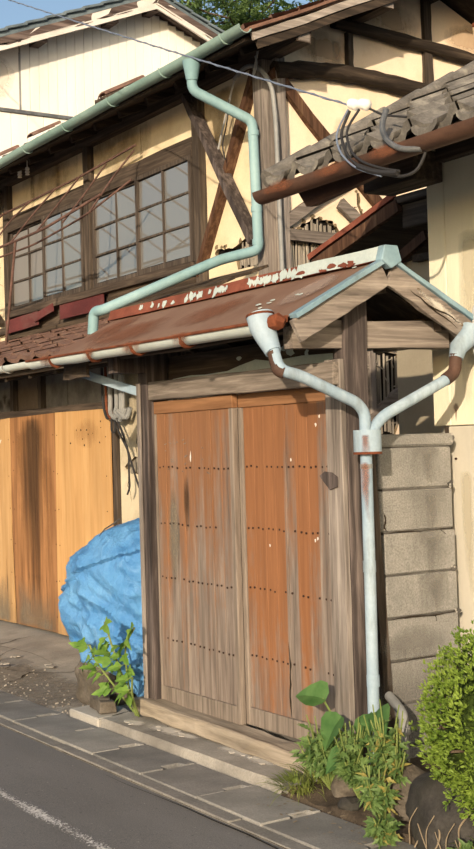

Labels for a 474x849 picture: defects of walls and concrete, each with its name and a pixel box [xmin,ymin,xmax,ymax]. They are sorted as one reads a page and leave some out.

peeling [139,285,228,310]
peeling [247,246,379,296]
corrosion [25,310,286,369]
water stain [24,421,39,545]